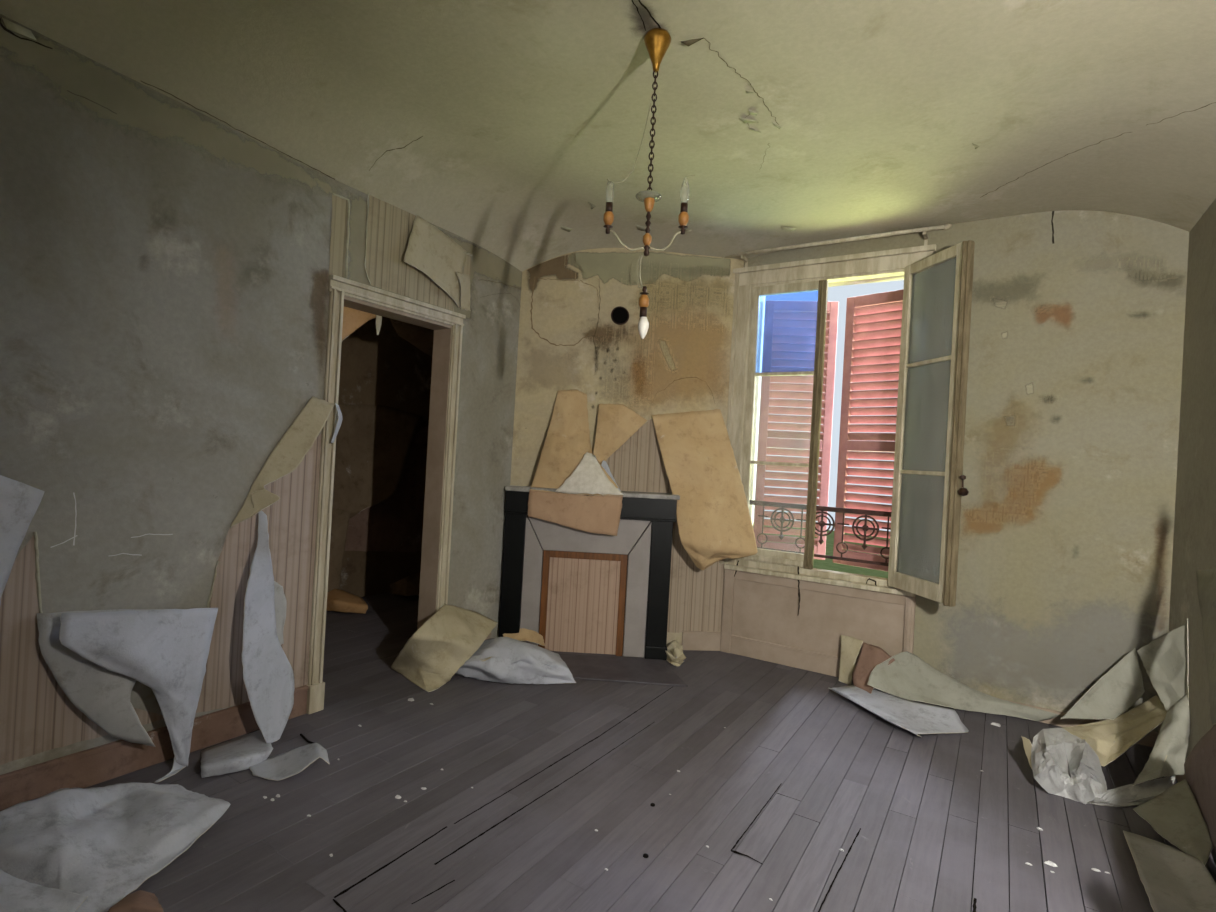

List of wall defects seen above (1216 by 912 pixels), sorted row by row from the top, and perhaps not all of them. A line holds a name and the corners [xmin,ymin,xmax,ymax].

crack [631,0,661,31]
crack [704,38,781,160]
peeling [364,193,454,311]
peeling [567,252,730,285]
crack [1048,211,1056,244]
peeling [606,419,672,493]
peeling [196,434,321,713]
peeling [0,532,108,766]